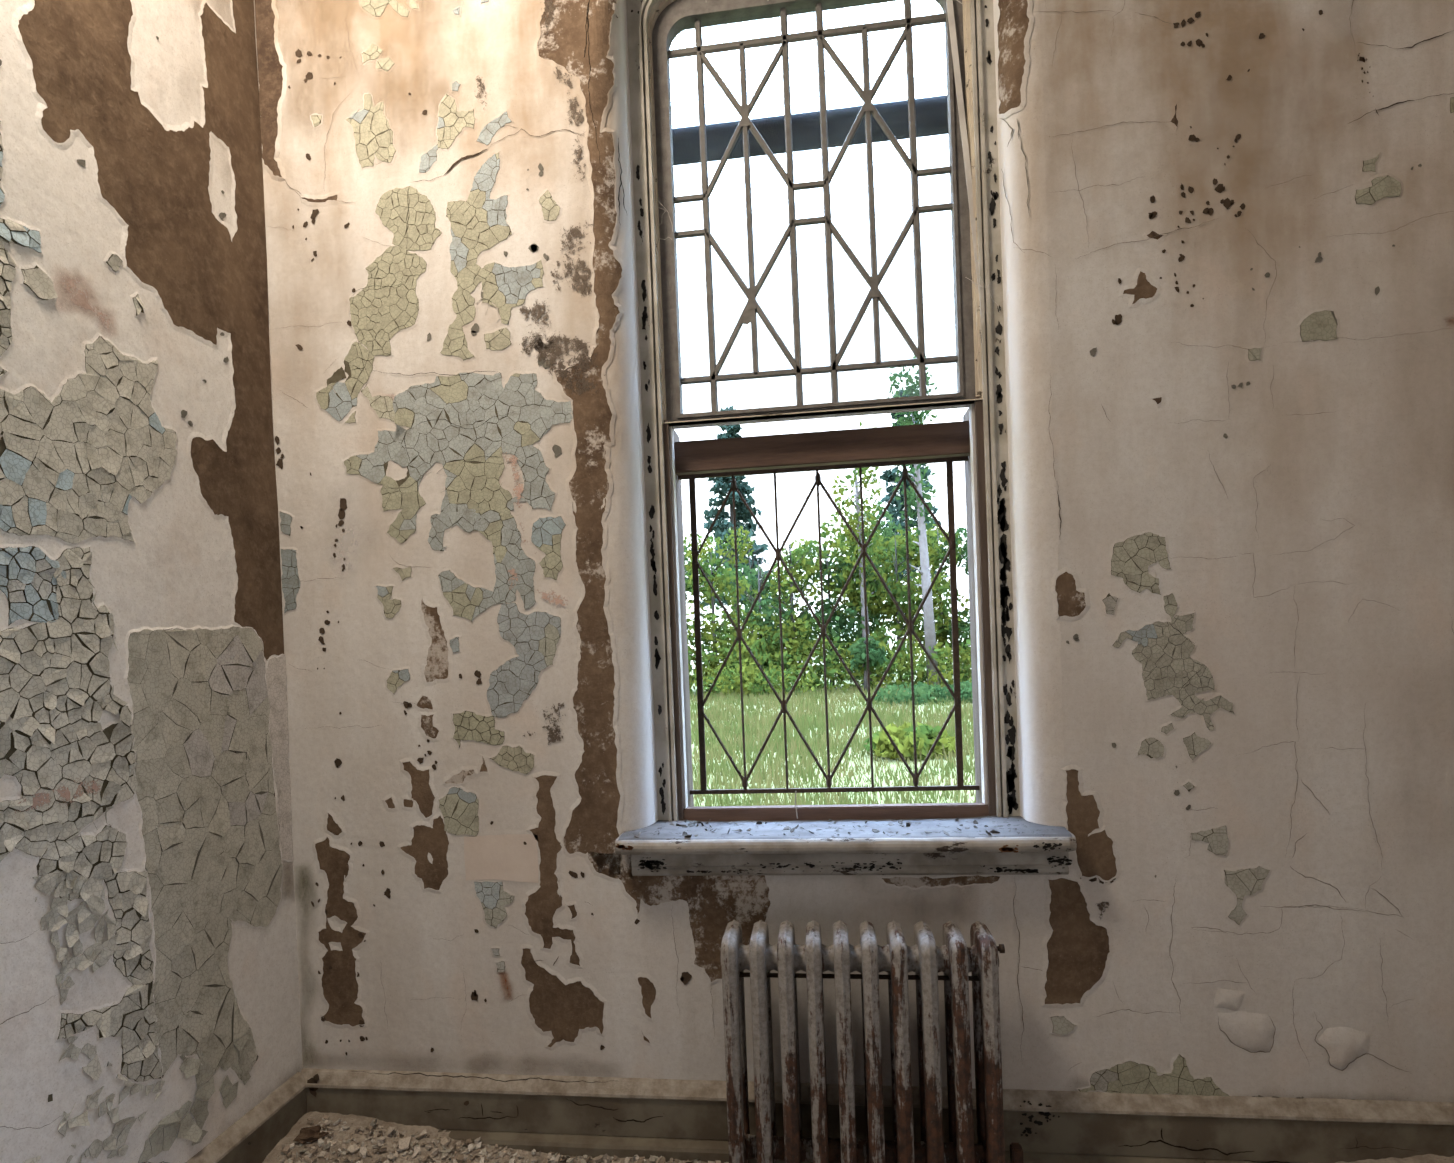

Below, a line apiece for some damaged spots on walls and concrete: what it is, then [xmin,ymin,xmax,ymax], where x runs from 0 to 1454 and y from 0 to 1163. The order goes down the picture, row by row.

spalling [0,0,342,1163]
peeling [1050,530,1236,810]
peeling [1188,823,1272,928]
peeling [1020,1100,1060,1137]
peeling [1075,1051,1232,1097]